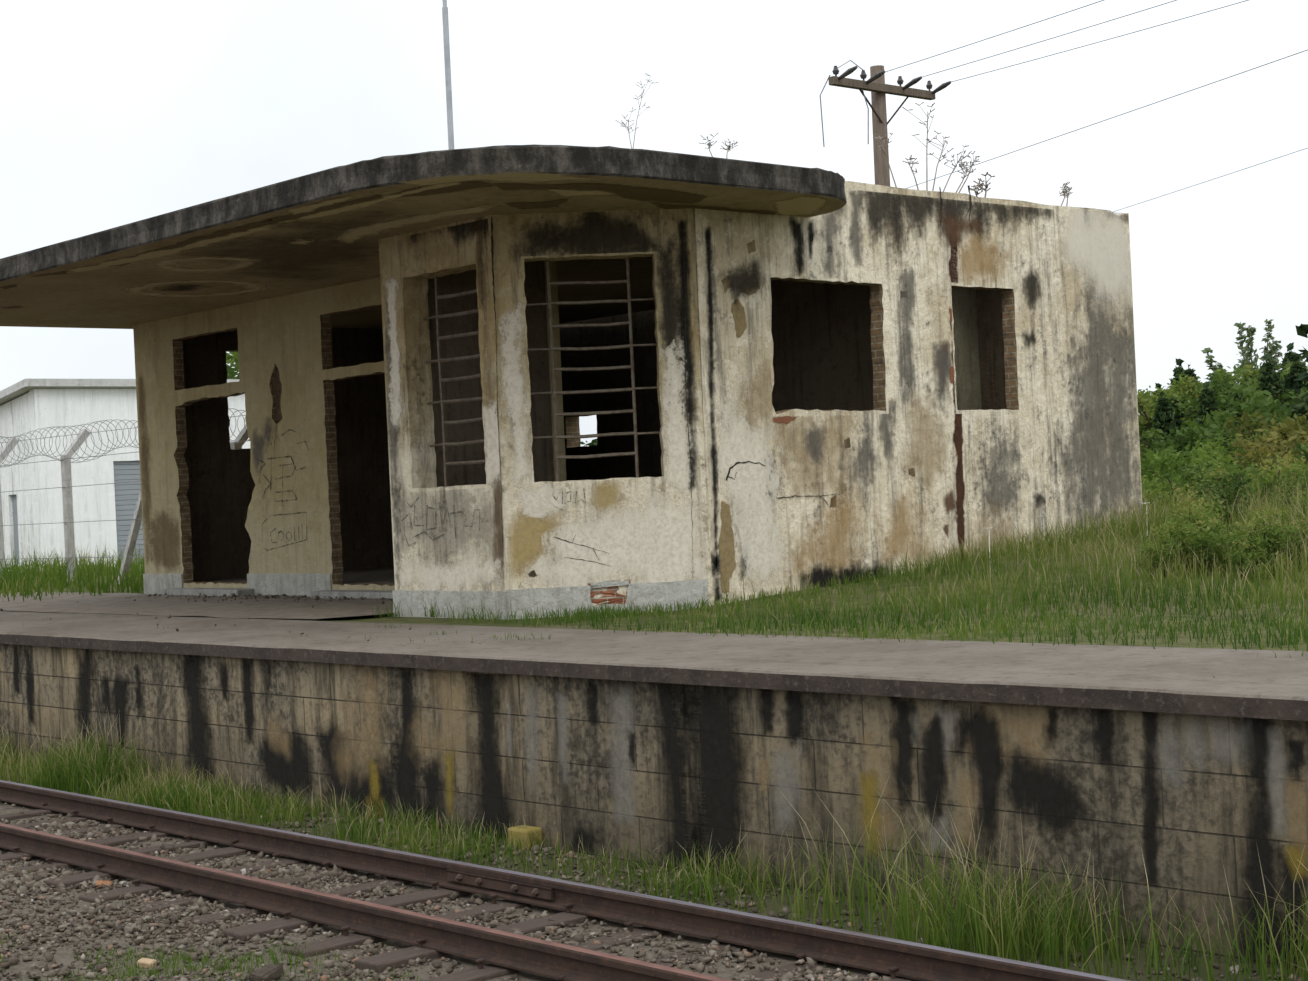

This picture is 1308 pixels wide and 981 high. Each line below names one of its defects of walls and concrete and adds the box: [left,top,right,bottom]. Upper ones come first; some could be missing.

damp [790,191,1052,282]
spalling [273,368,283,423]
peeling [386,276,402,425]
peeling [483,303,796,605]
damp [519,212,764,601]
crack [679,227,693,561]
crack [726,461,765,481]
corrosion [938,317,965,561]
damp [1056,283,1142,531]
peeling [397,544,504,591]
damp [76,649,141,753]
damp [891,697,1081,842]